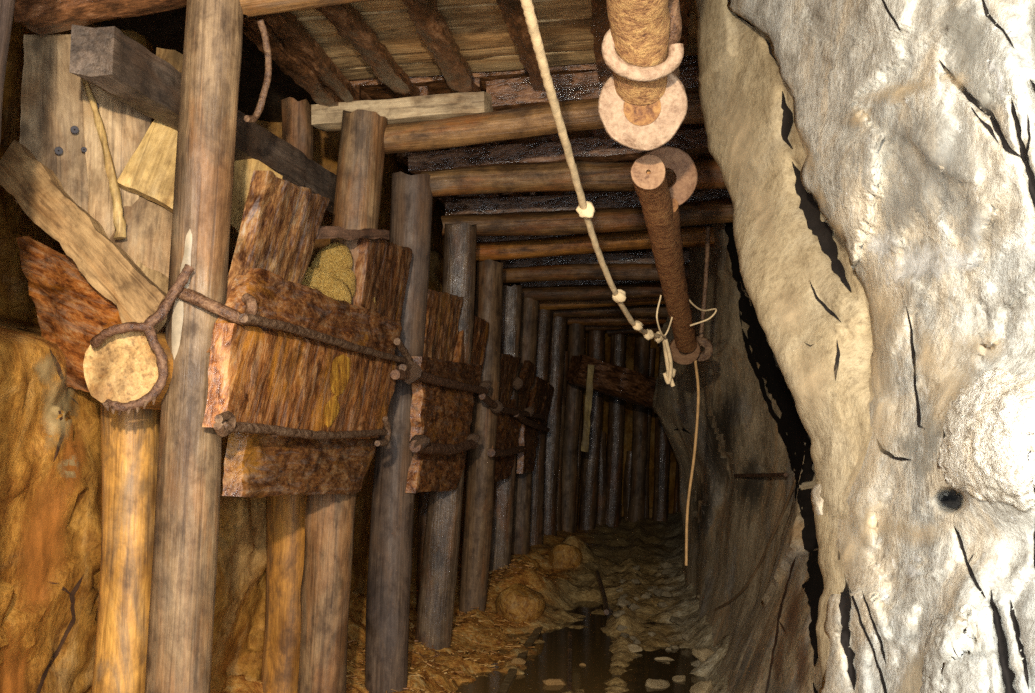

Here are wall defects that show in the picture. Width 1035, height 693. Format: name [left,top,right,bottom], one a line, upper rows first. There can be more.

crack [939,60,1035,207]
crack [725,223,887,693]
crack [954,526,1029,693]